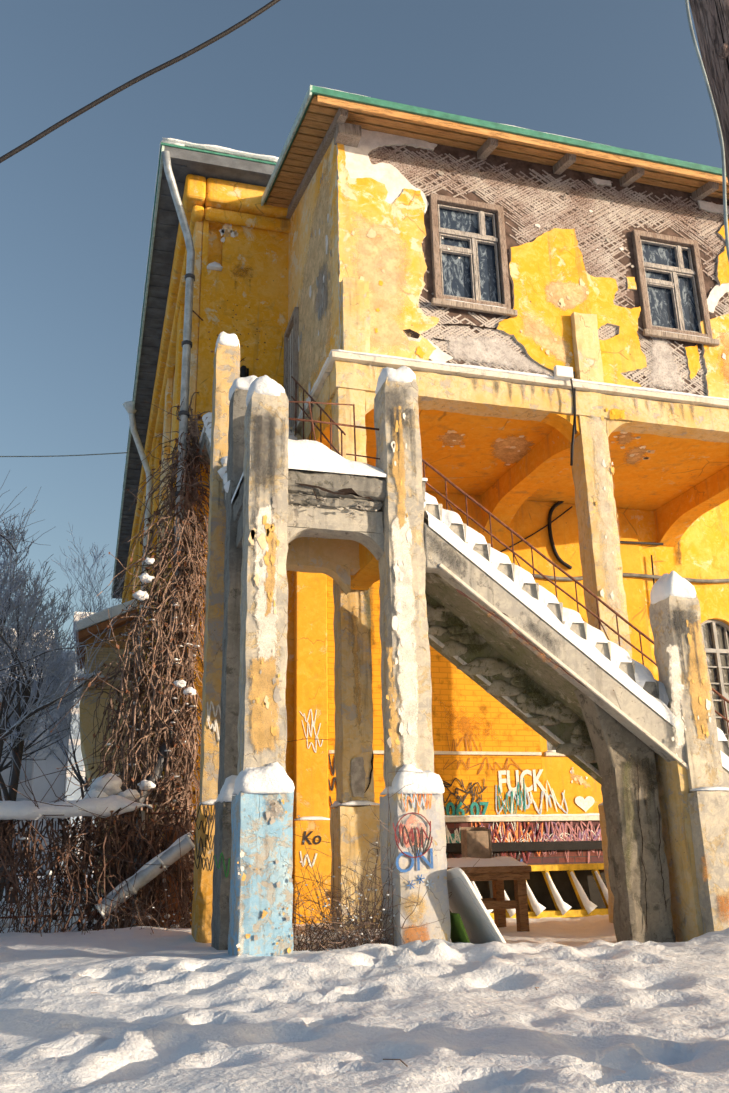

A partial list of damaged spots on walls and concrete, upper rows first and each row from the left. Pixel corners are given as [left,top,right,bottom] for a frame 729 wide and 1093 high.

spalling [297,129,729,396]
leakage [250,416,285,523]
peeling [247,493,383,754]
leakage [392,408,416,473]
spalling [386,406,597,787]
peeling [592,408,655,609]
leakage [675,611,700,680]
spalling [350,752,374,798]